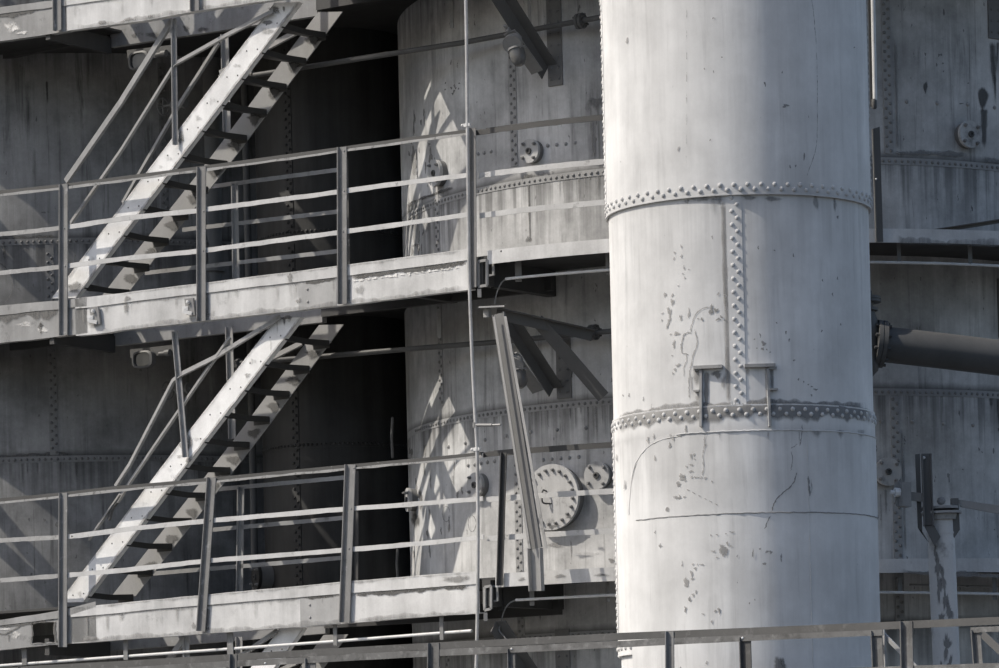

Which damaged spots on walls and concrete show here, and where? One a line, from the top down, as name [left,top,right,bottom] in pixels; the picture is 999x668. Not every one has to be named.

corrosion [979,43,999,144]
peeling [661,245,727,375]
peeling [665,453,713,511]
crack [764,428,803,529]